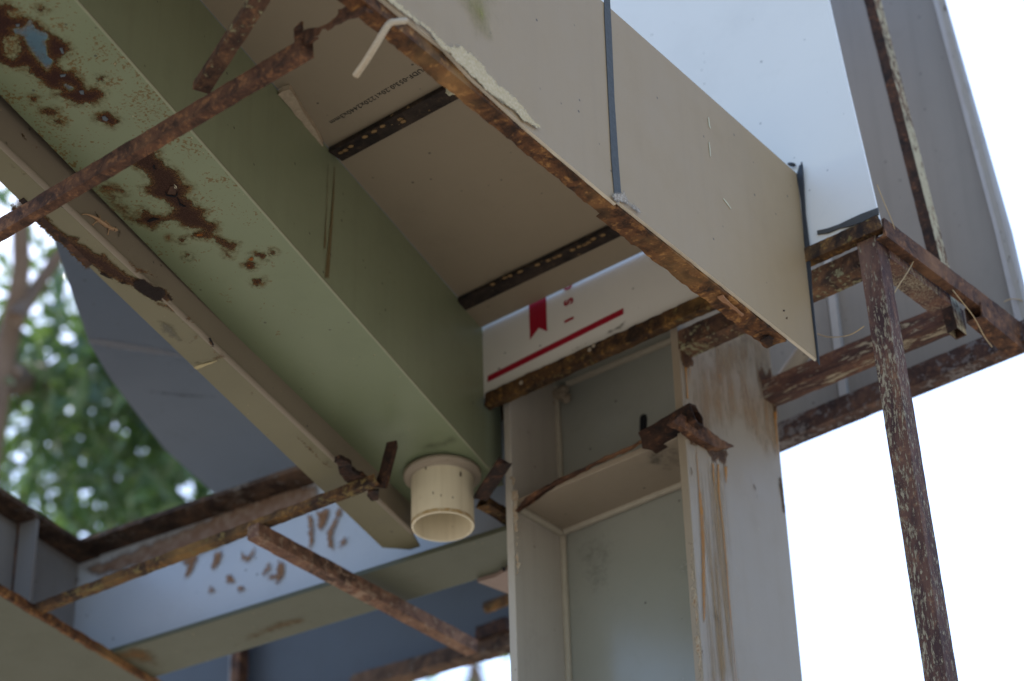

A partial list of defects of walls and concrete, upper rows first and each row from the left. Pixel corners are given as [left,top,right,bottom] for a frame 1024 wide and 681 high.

corrosion [0,0,374,312]
peeling [389,0,541,128]
corrosion [87,487,477,656]
corrosion [690,440,734,681]